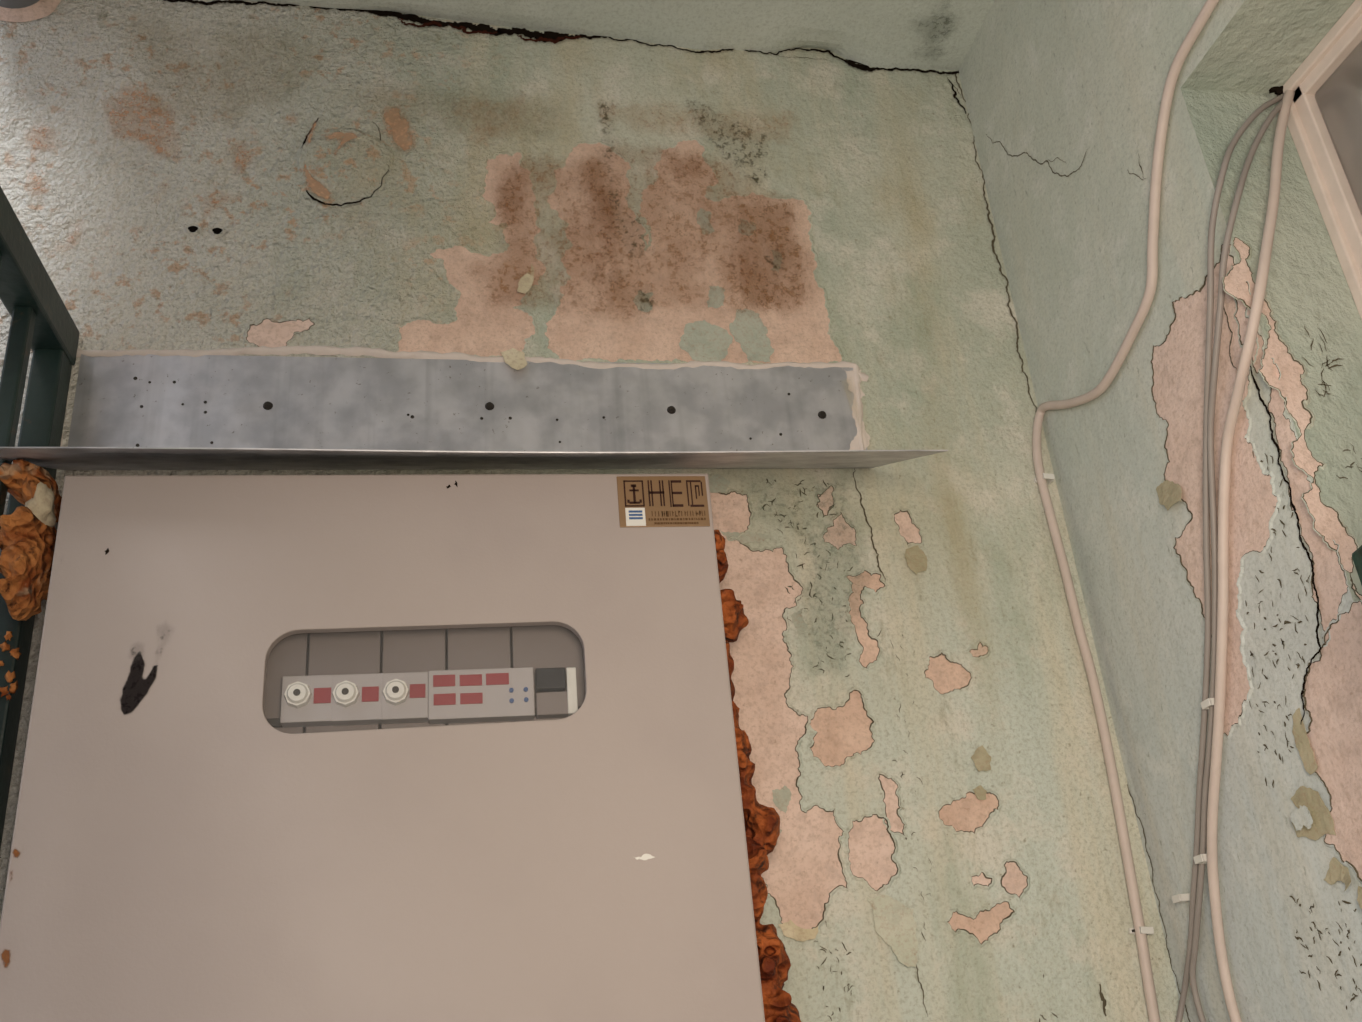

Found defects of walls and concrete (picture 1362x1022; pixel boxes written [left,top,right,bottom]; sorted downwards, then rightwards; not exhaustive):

peeling [393,138,845,370]
crack [164,0,1087,412]
peeling [710,483,908,942]
peeling [890,508,928,575]
peeling [921,639,991,697]
peeling [935,745,1002,836]
peeling [943,858,1030,948]
peeling [1150,237,1362,909]
crack [1224,308,1321,788]